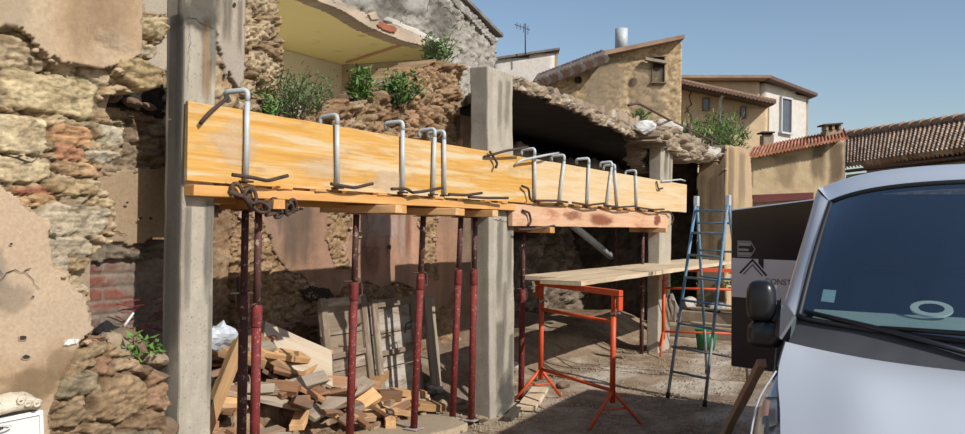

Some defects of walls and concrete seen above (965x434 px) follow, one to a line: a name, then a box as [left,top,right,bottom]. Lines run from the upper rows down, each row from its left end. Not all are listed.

spalling [0,11,170,345]
spalling [227,211,318,330]
spalling [325,213,363,269]
spalling [334,282,416,317]